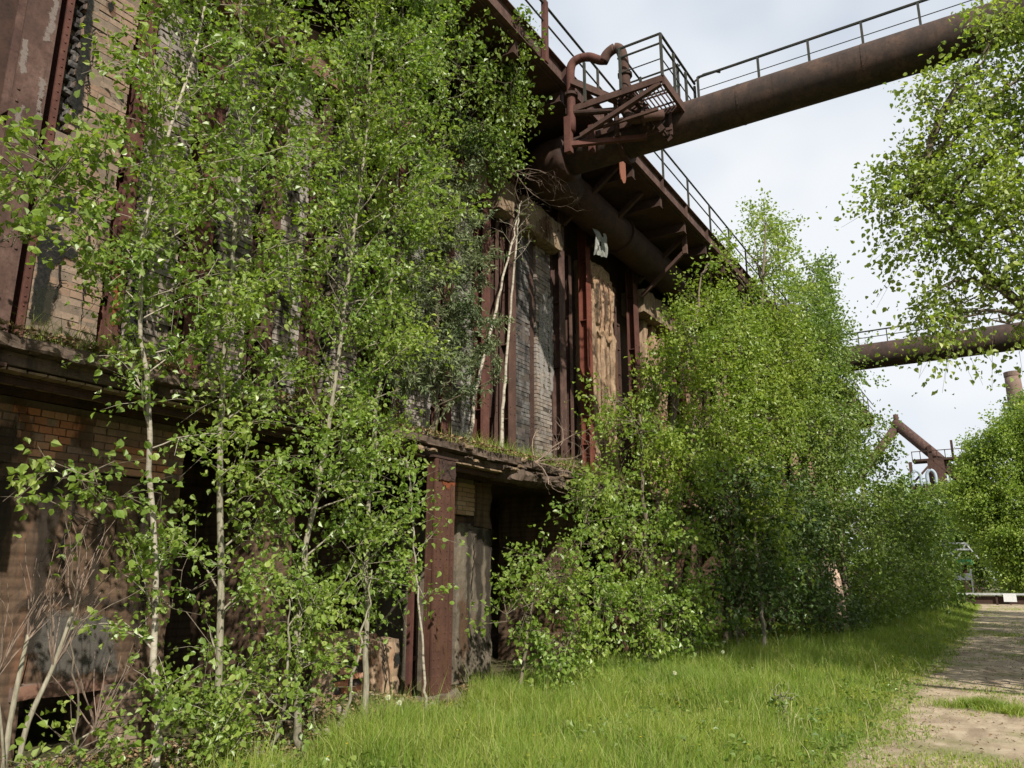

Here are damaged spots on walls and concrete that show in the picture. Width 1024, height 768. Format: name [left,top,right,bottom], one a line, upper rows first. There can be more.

damp [467,528,492,662]